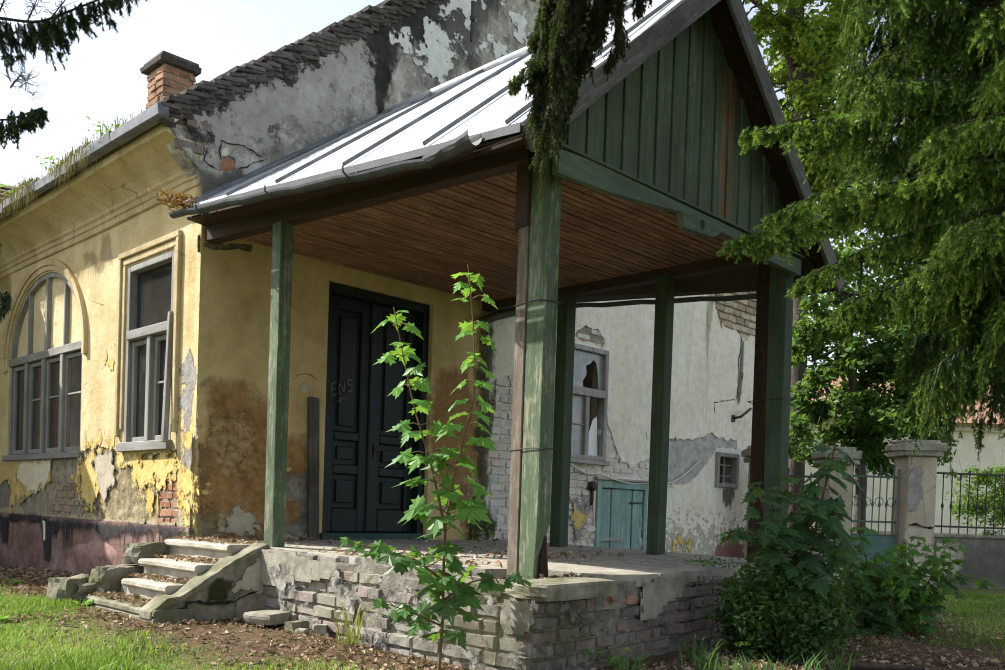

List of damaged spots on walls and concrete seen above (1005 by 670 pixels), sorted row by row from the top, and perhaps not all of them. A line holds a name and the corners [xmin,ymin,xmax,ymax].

peeling [171,37,376,171]
leakage [183,0,499,144]
peeling [388,0,532,84]
crack [203,140,265,171]
spalling [575,326,607,349]
spalling [711,291,757,341]
spalling [0,349,264,537]
spalling [459,374,514,540]
spalling [568,426,650,546]
spalling [667,433,736,488]
spalling [896,467,924,512]
leakage [0,513,178,561]